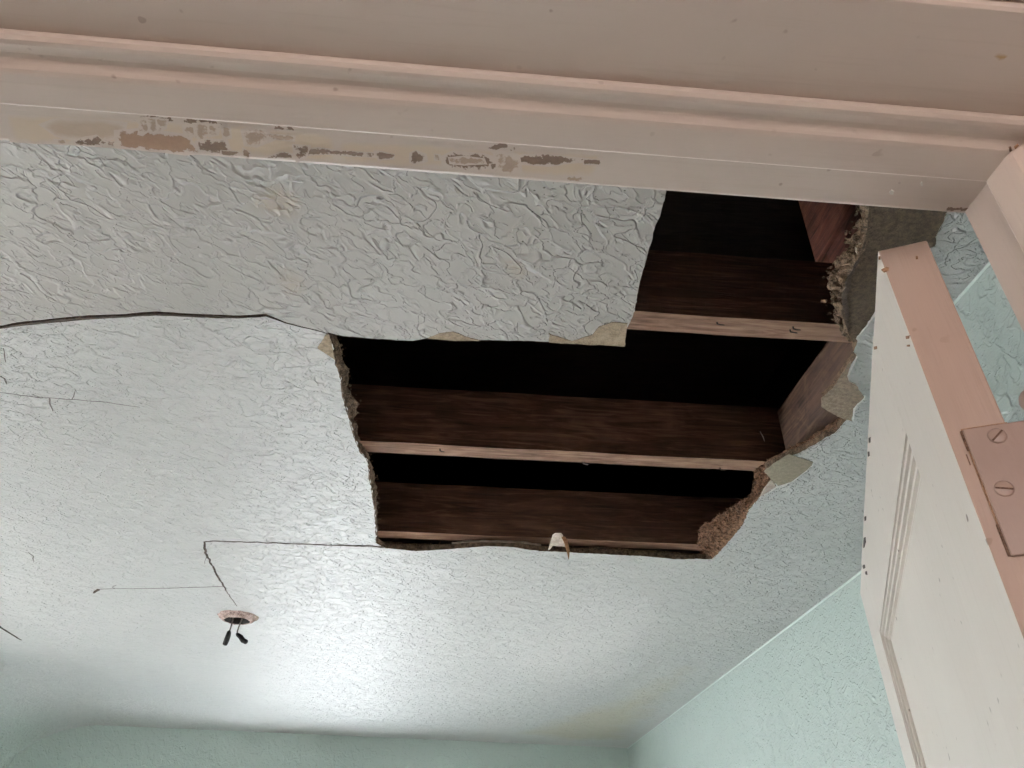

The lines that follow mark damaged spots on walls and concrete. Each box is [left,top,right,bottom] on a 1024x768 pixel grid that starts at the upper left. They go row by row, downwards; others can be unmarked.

peeling [5,112,607,182]
crack [0,313,327,411]
peeling [428,332,480,341]
peeling [549,322,628,347]
peeling [760,454,814,497]
crack [93,541,384,606]